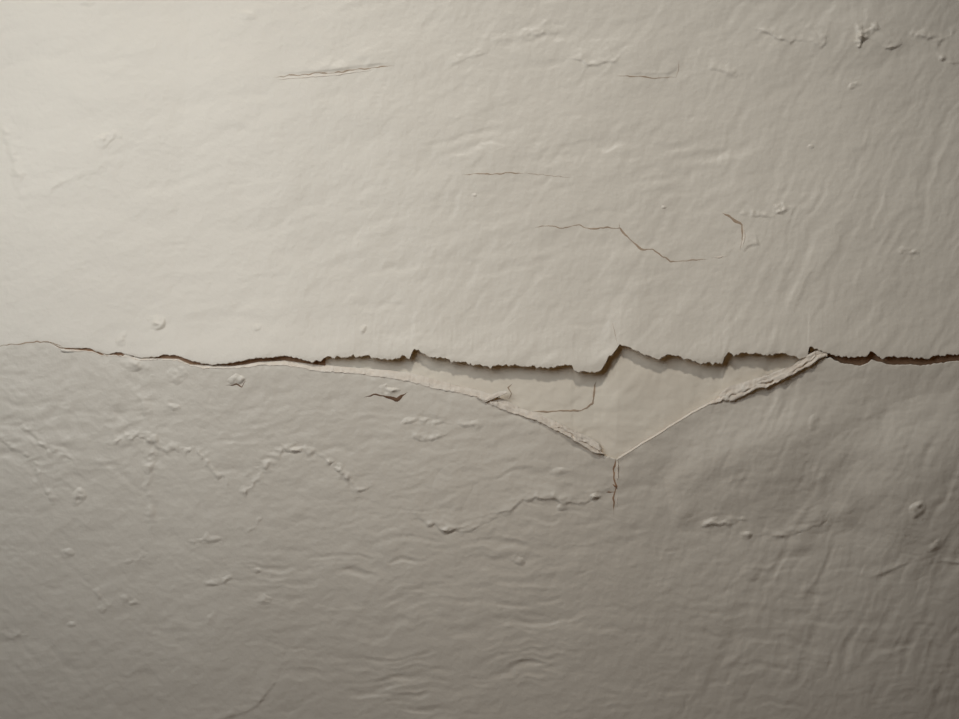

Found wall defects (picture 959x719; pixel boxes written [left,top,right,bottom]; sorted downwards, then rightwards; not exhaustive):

crack [539,213,760,262]
crack [1,303,328,409]
peeling [323,304,827,496]
crack [826,310,959,402]
crack [607,460,619,510]